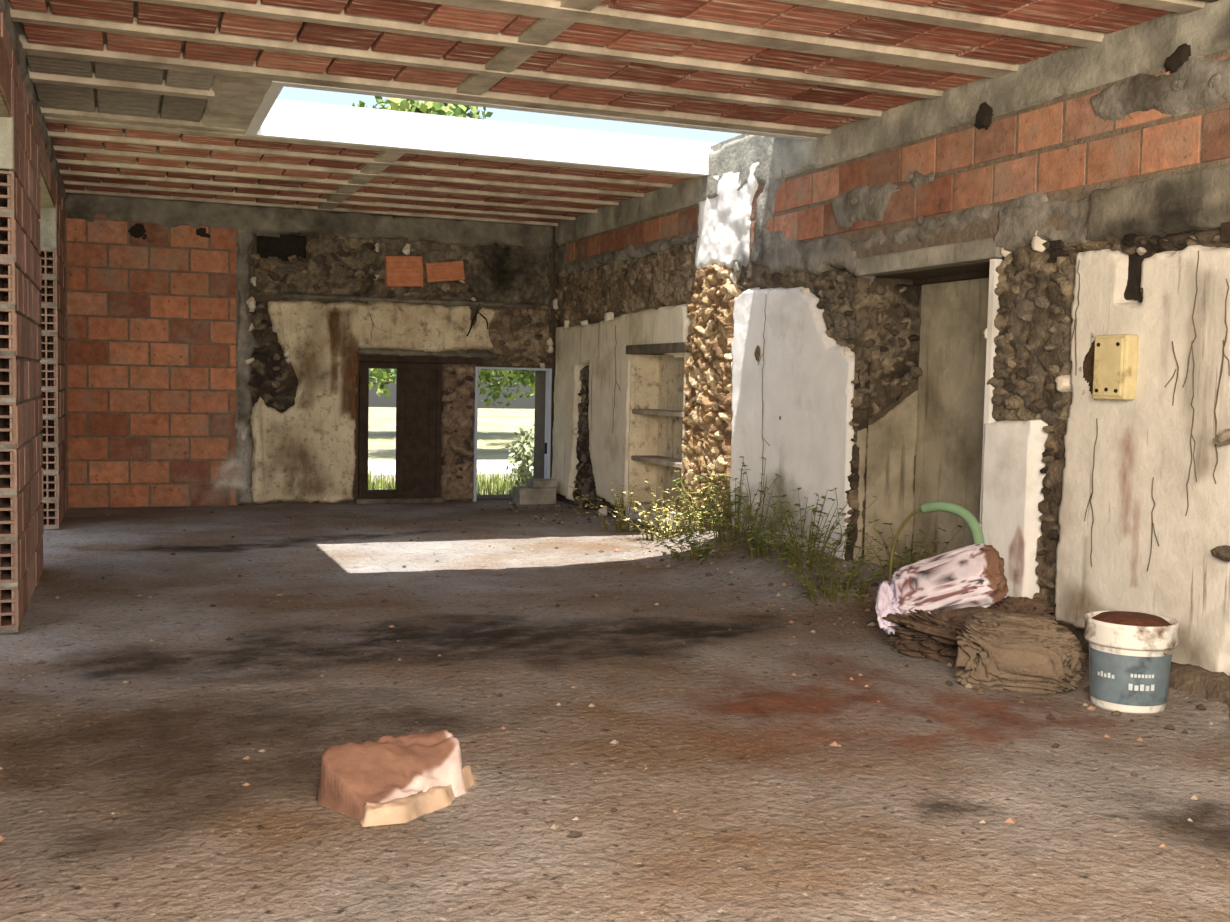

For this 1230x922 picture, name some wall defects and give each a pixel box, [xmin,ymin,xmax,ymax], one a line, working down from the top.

spalling [245,233,923,561]
spalling [983,227,1230,627]
crack [1147,478,1159,571]
crack [1165,250,1230,516]